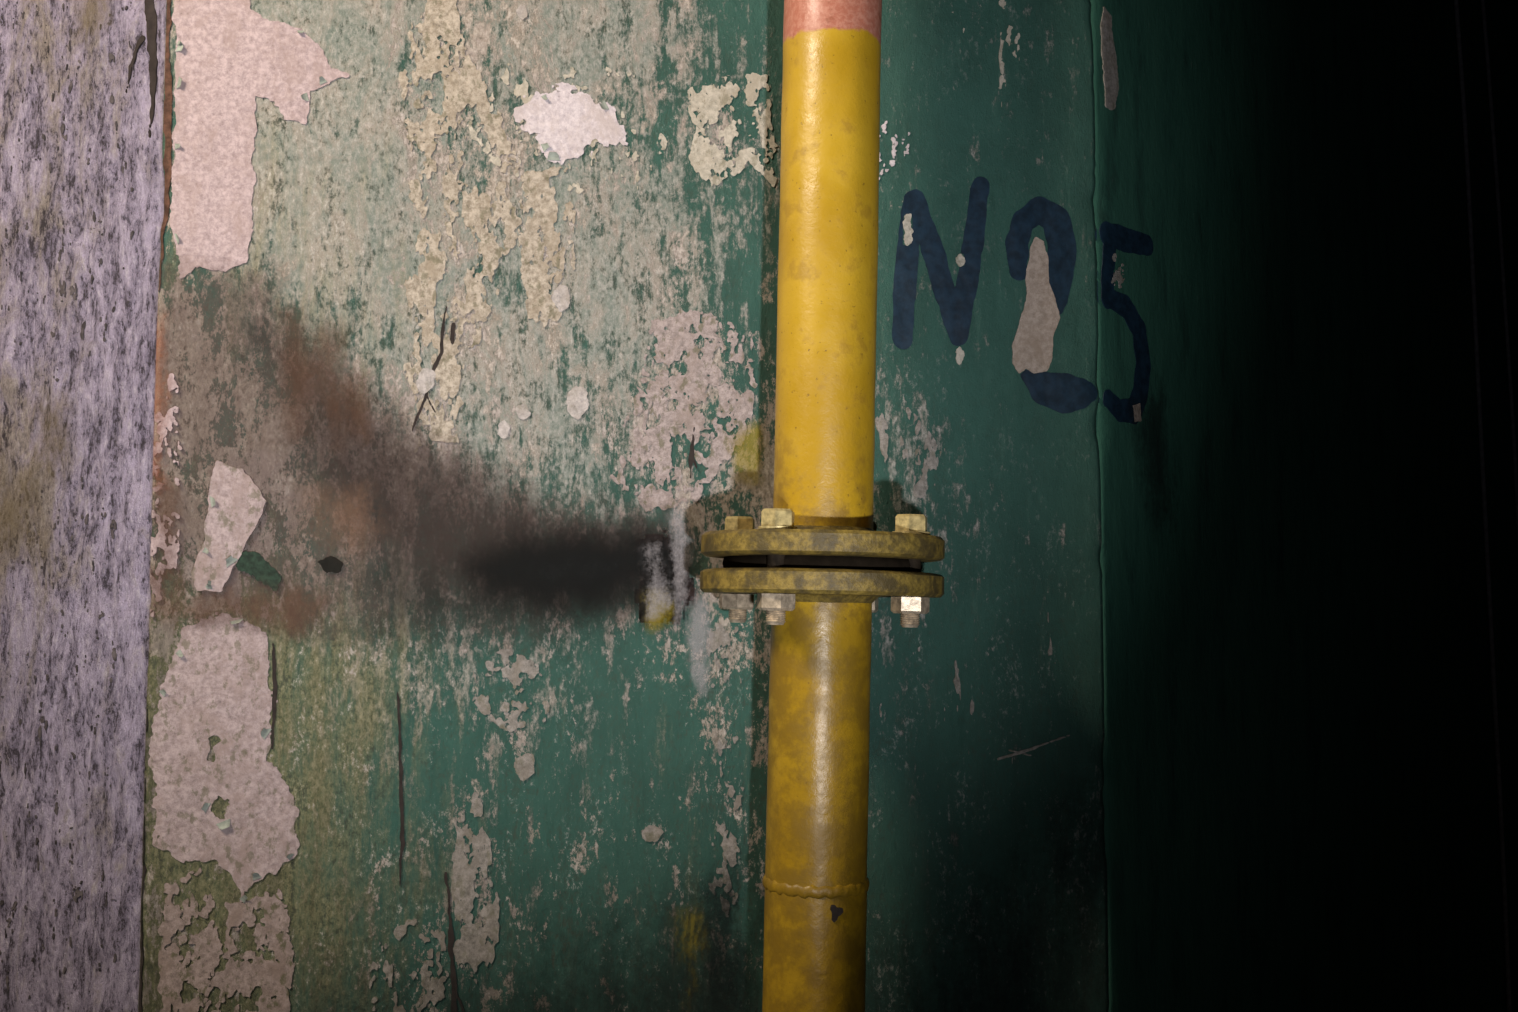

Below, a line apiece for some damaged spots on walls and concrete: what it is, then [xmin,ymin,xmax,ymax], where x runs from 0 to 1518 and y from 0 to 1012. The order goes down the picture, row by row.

peeling [169,0,350,279]
peeling [398,0,667,454]
peeling [687,72,778,187]
peeling [1012,237,1060,374]
spalling [1100,7,1119,110]
peeling [150,373,267,617]
peeling [610,309,758,512]
peeling [148,612,300,1012]
peeling [369,792,500,1012]
peeling [472,649,550,732]
peeling [514,753,535,781]
peeling [708,736,744,917]